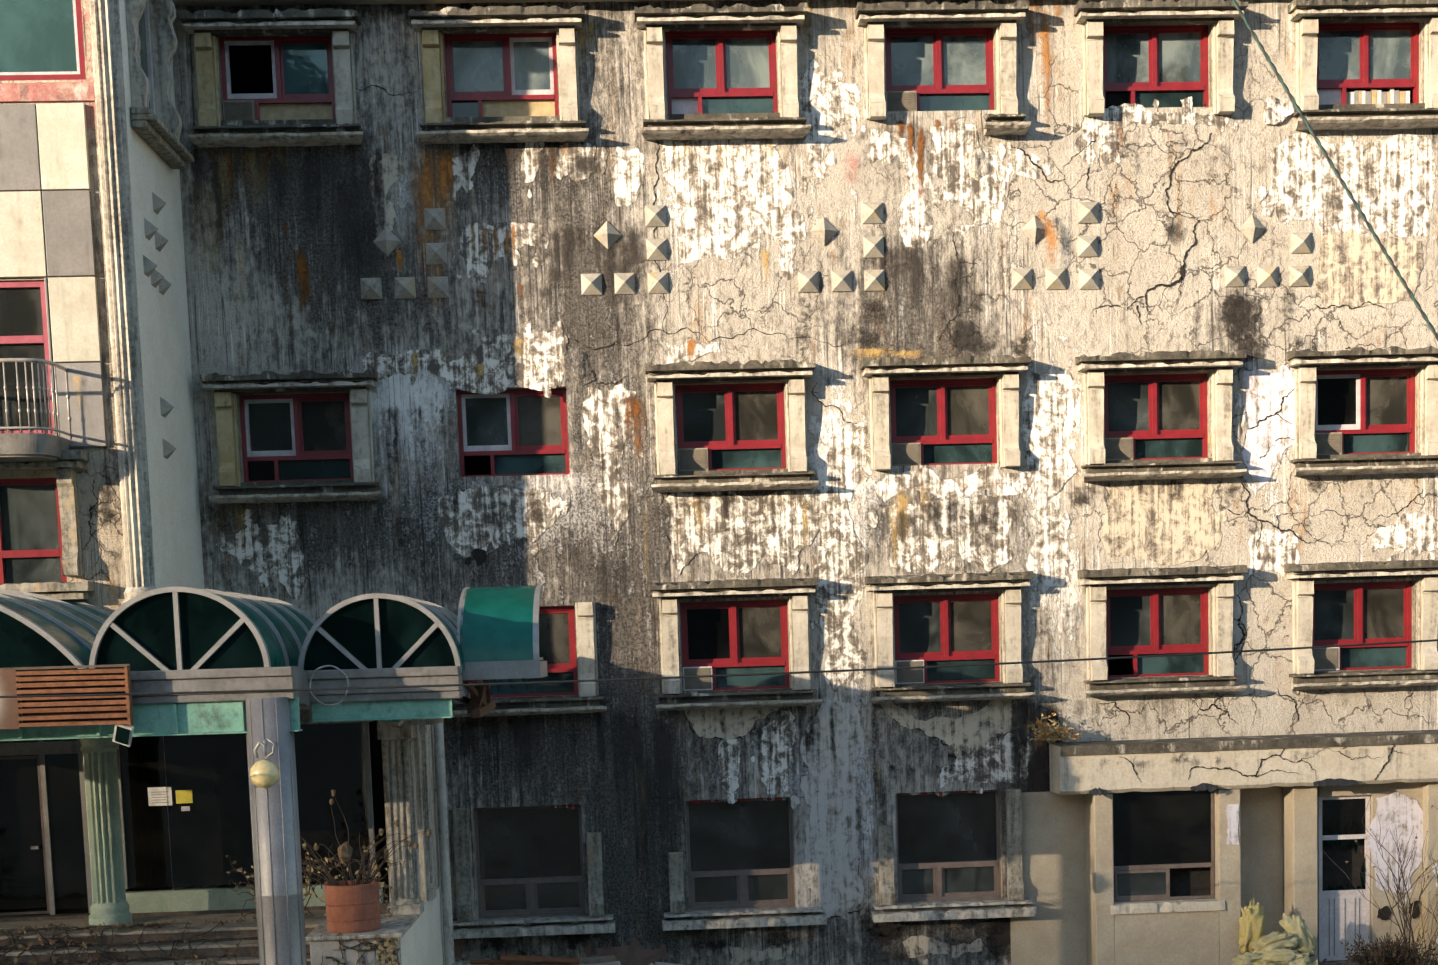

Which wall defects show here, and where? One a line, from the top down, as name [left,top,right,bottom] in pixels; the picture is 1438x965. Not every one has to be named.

rust [1029,2,1060,110]
rust [414,152,453,244]
peeling [361,321,568,398]
peeling [661,59,1053,281]
water stain [879,240,922,323]
water stain [944,255,1028,358]
crack [1095,133,1212,325]
water stain [1220,289,1268,361]
peeling [582,383,644,546]
crack [1228,388,1423,554]
peeling [665,370,1084,920]
crack [1179,688,1401,780]